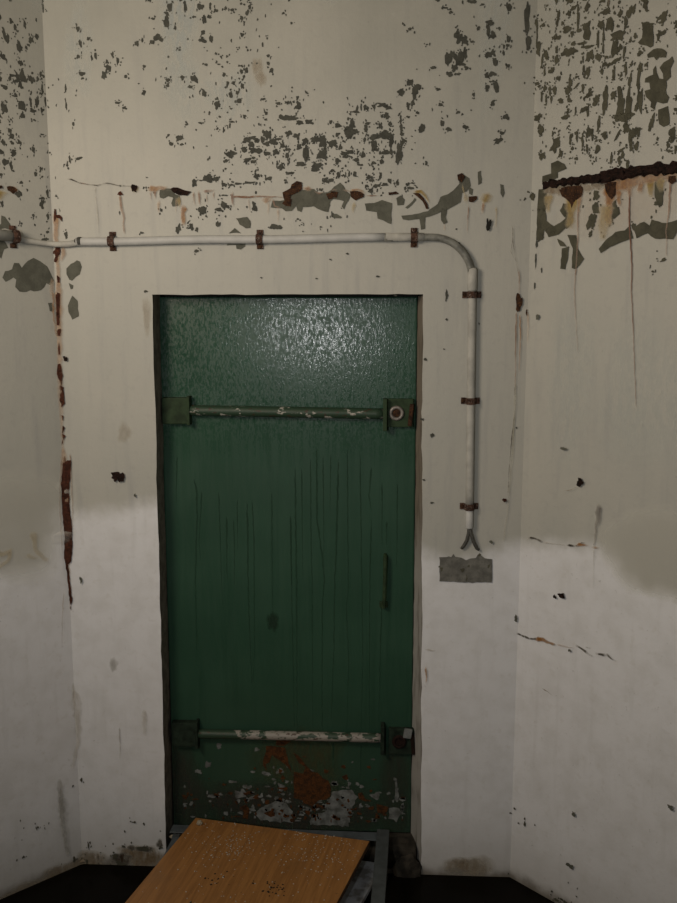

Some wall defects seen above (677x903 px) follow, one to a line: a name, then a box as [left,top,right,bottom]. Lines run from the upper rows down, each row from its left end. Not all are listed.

peeling [429,0,512,109]
peeling [0,0,87,241]
peeling [133,0,482,234]
spalling [500,0,677,273]
corrosion [149,186,214,223]
corrosion [231,181,338,208]
corrosion [350,189,376,207]
corrosion [457,173,496,220]
peeling [2,258,54,292]
corrosion [545,173,677,398]
damp [608,513,677,595]
damp [0,840,163,899]